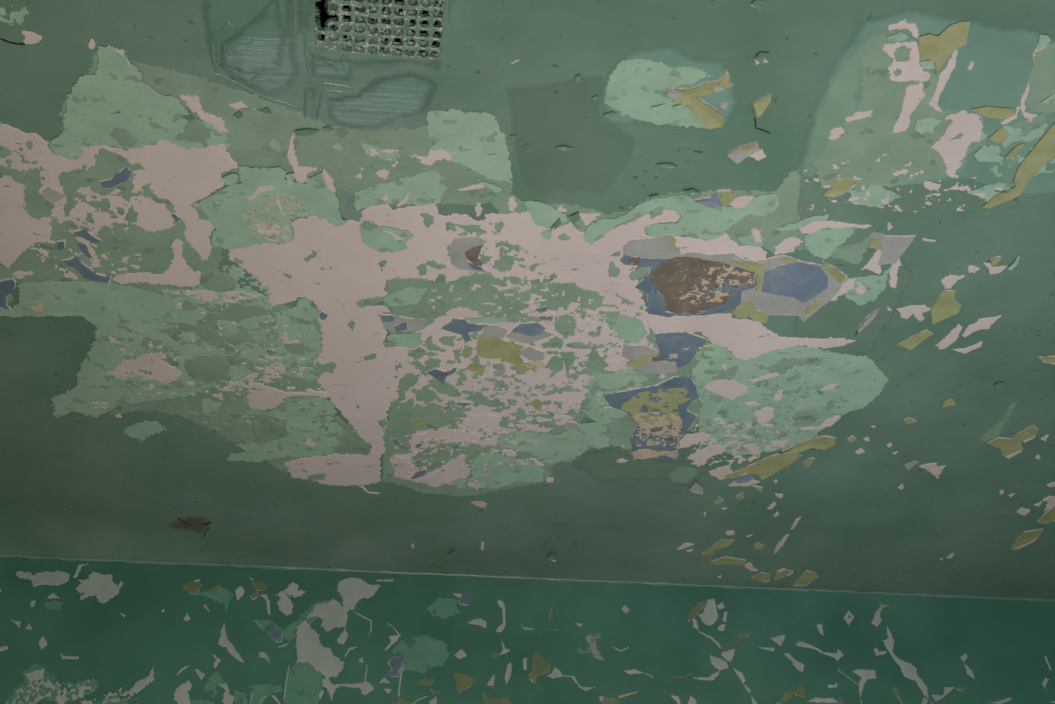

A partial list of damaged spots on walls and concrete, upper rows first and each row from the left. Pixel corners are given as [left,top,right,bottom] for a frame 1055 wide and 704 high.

peeling [0,5,42,45]
peeling [1011,482,1055,551]
peeling [15,563,123,610]
peeling [11,619,47,650]
peeling [173,577,467,704]
peeling [427,593,639,704]
peeling [671,599,757,704]
peeling [758,635,876,704]
peeling [871,601,975,704]